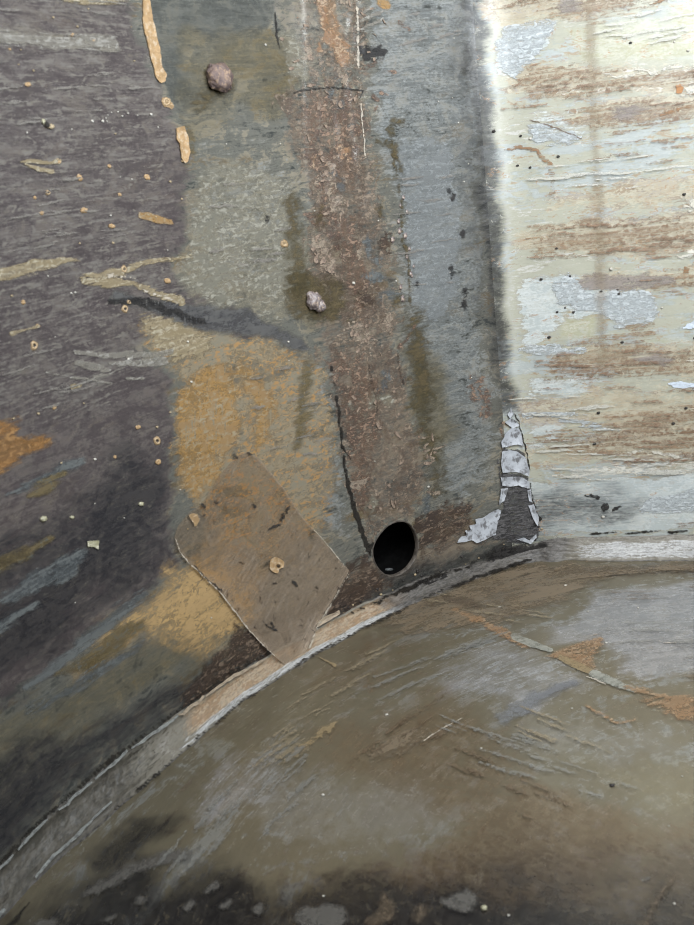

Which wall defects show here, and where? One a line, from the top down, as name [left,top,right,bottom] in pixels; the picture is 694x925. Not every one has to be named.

corrosion [142,0,167,83]
corrosion [176,126,196,163]
crack [294,1,366,156]
corrosion [273,0,432,542]
corrosion [0,420,52,474]
crack [330,366,374,556]
peeling [457,408,542,544]
corrosion [452,608,694,721]